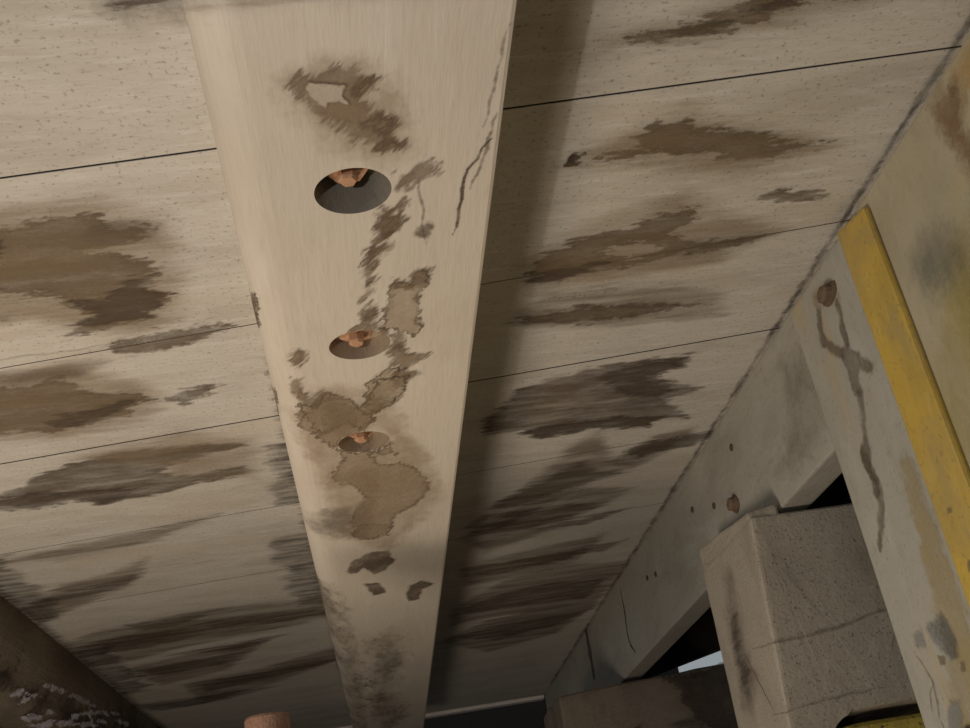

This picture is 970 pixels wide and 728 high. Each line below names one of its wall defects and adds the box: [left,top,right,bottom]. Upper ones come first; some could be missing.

leakage [624,0,803,51]
leakage [563,118,836,167]
crack [452,132,492,235]
leakage [523,206,766,283]
leakage [0,212,237,357]
leakage [515,290,700,326]
leakage [0,370,226,435]
leakage [482,353,694,439]
leakage [0,444,249,512]
leakage [468,423,714,548]